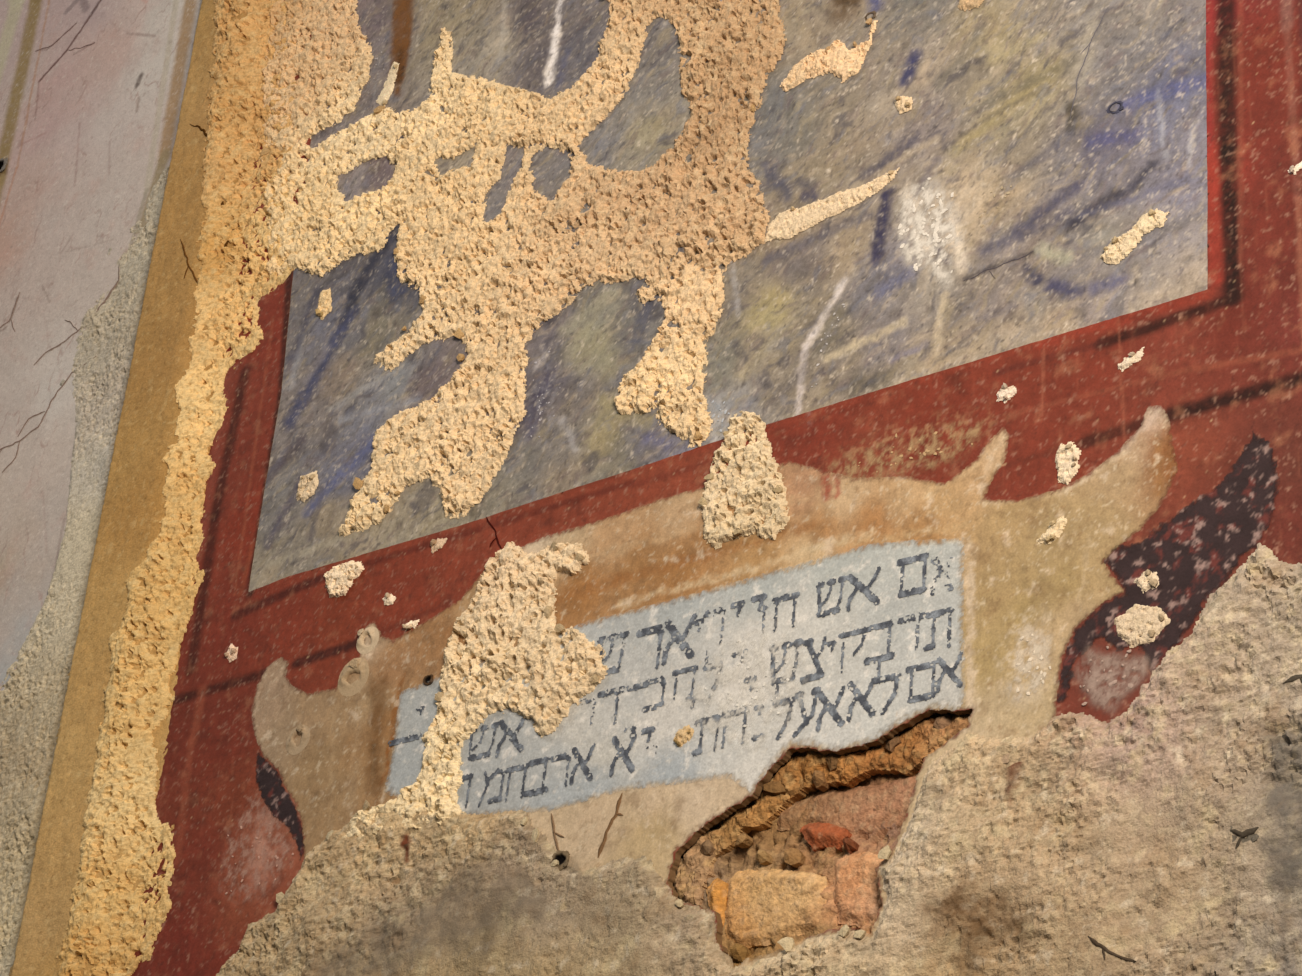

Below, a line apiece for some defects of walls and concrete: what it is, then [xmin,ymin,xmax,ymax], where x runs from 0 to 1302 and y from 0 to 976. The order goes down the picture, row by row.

crack [0,259,121,473]
spalling [0,165,170,976]
spalling [56,0,900,976]
spalling [216,541,1302,976]
spalling [1036,516,1067,545]